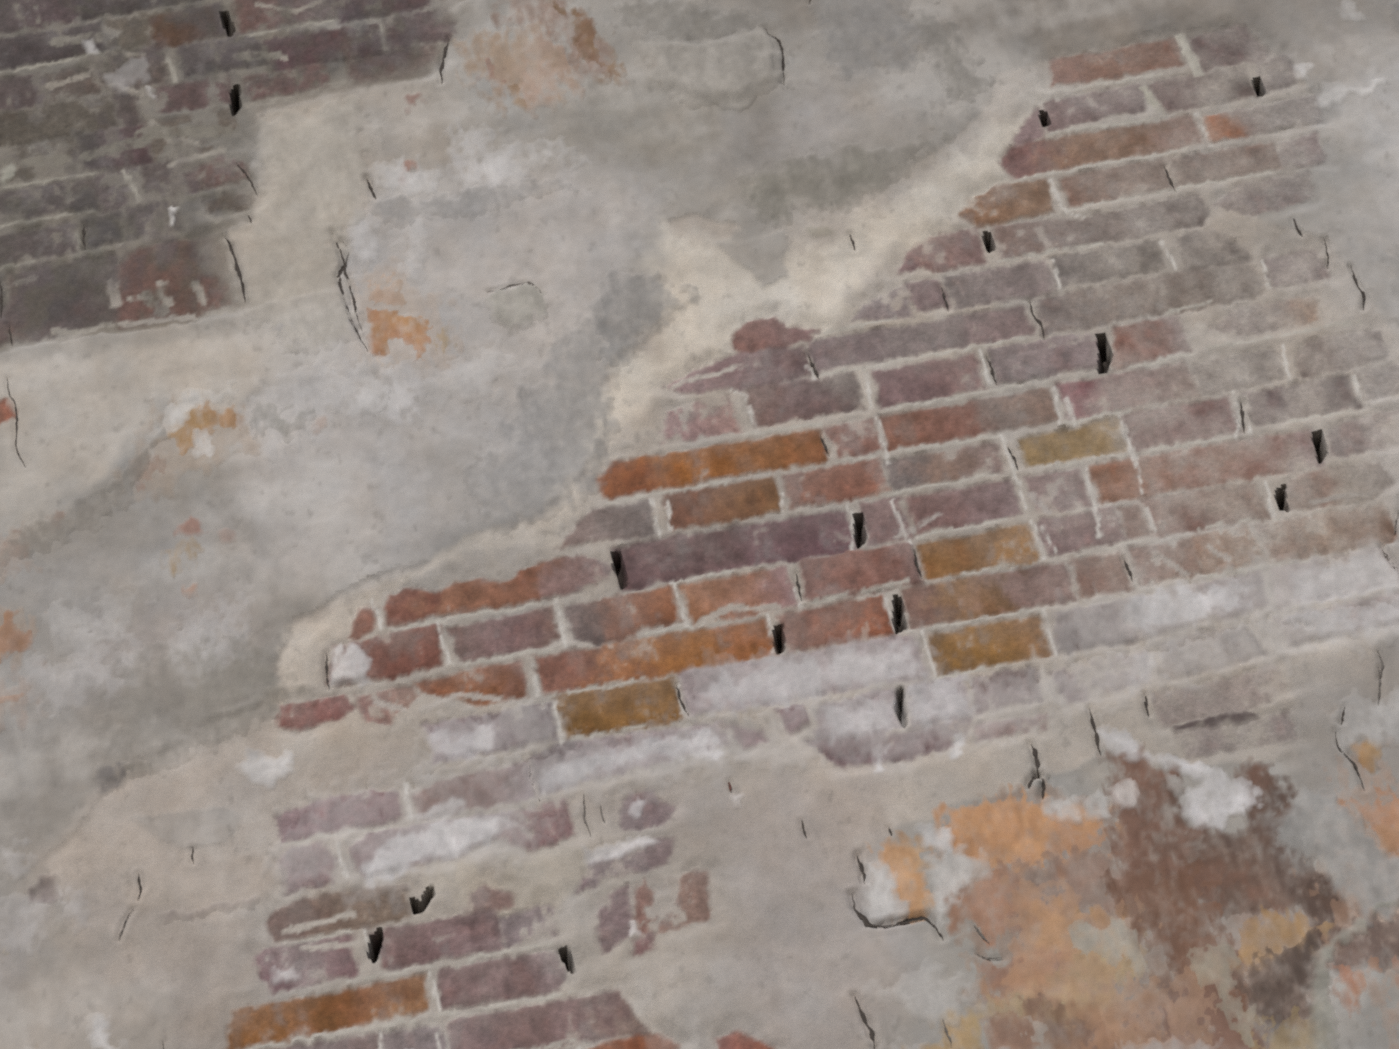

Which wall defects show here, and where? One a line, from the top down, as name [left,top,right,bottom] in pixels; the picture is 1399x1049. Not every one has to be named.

spalling [0,0,467,379]
crack [332,232,368,351]
spalling [0,399,15,423]
spalling [272,22,1399,748]
spalling [41,645,1379,1049]
spalling [1322,753,1399,856]
crack [855,997,875,1043]
spalling [1328,908,1399,1049]